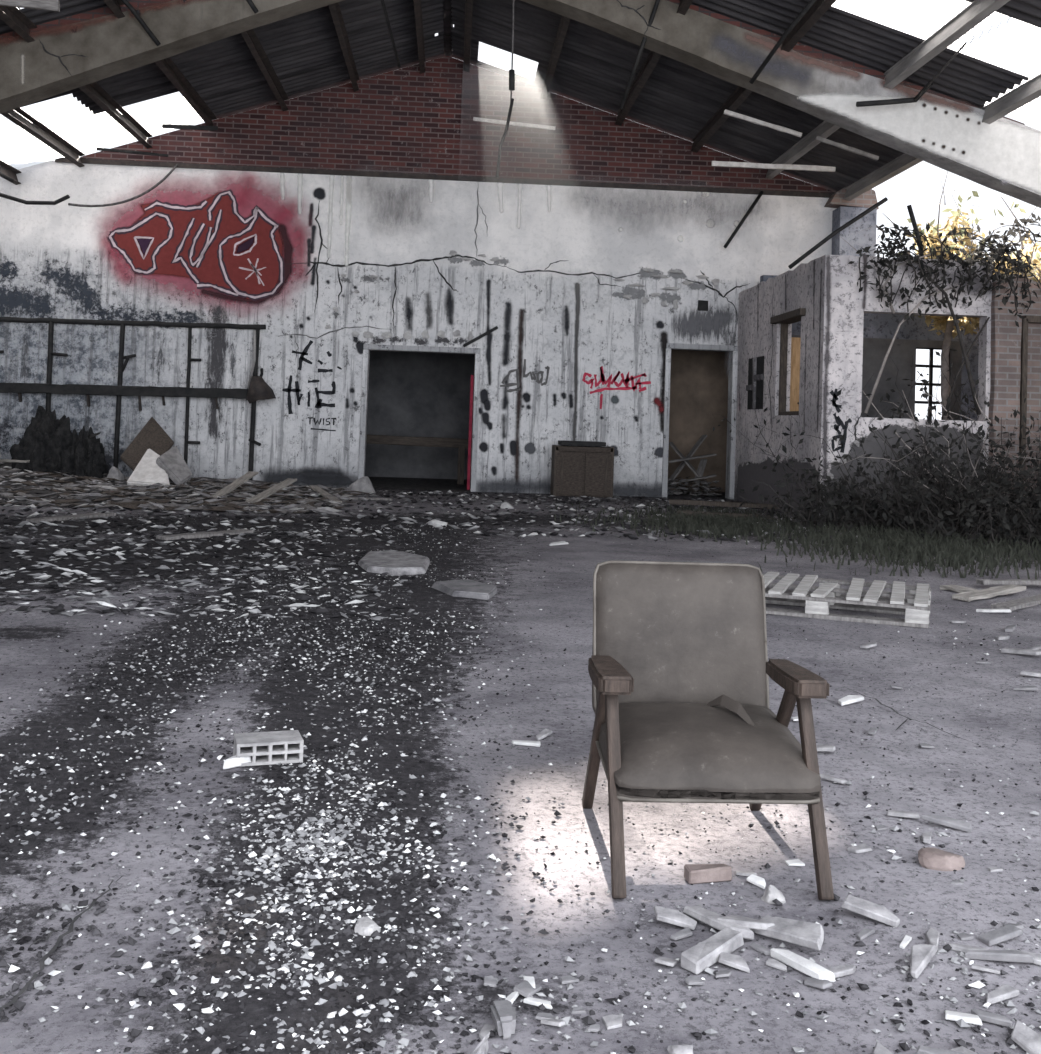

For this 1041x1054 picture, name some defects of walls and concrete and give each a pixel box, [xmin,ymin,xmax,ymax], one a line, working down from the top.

crack [280,189,640,360]
water stain [0,253,236,441]
water stain [671,307,738,373]
water stain [263,469,357,488]
water stain [478,481,551,494]
water stain [613,484,668,498]